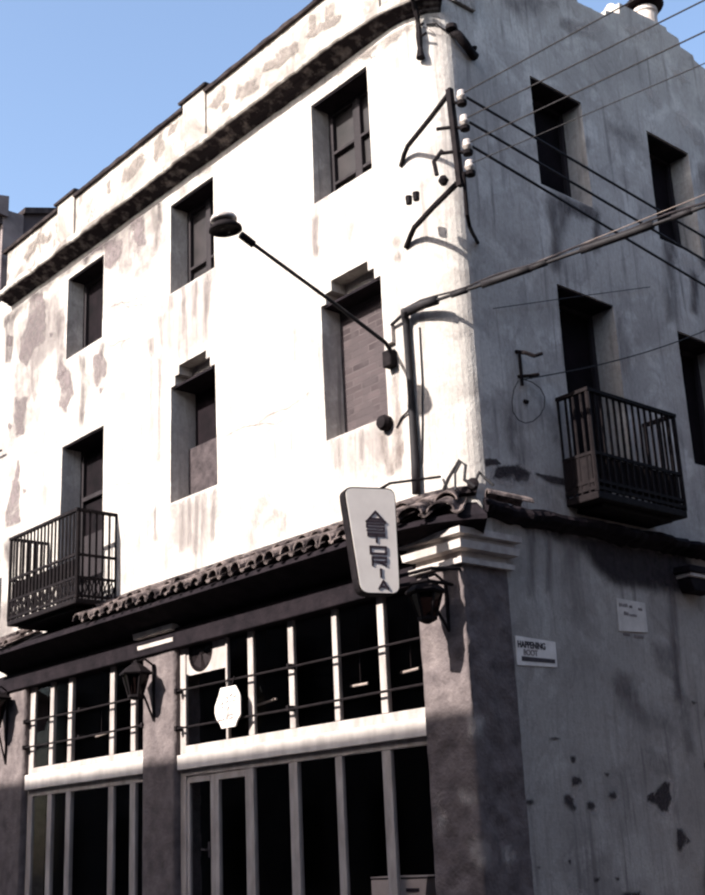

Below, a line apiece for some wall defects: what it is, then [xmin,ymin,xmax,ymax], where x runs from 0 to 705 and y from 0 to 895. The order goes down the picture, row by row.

peeling [7,293,53,365]
peeling [57,361,73,411]
peeling [93,352,106,393]
peeling [8,397,27,436]
peeling [5,460,26,526]
spalling [565,777,582,810]
spalling [647,780,673,815]
spalling [677,829,690,851]